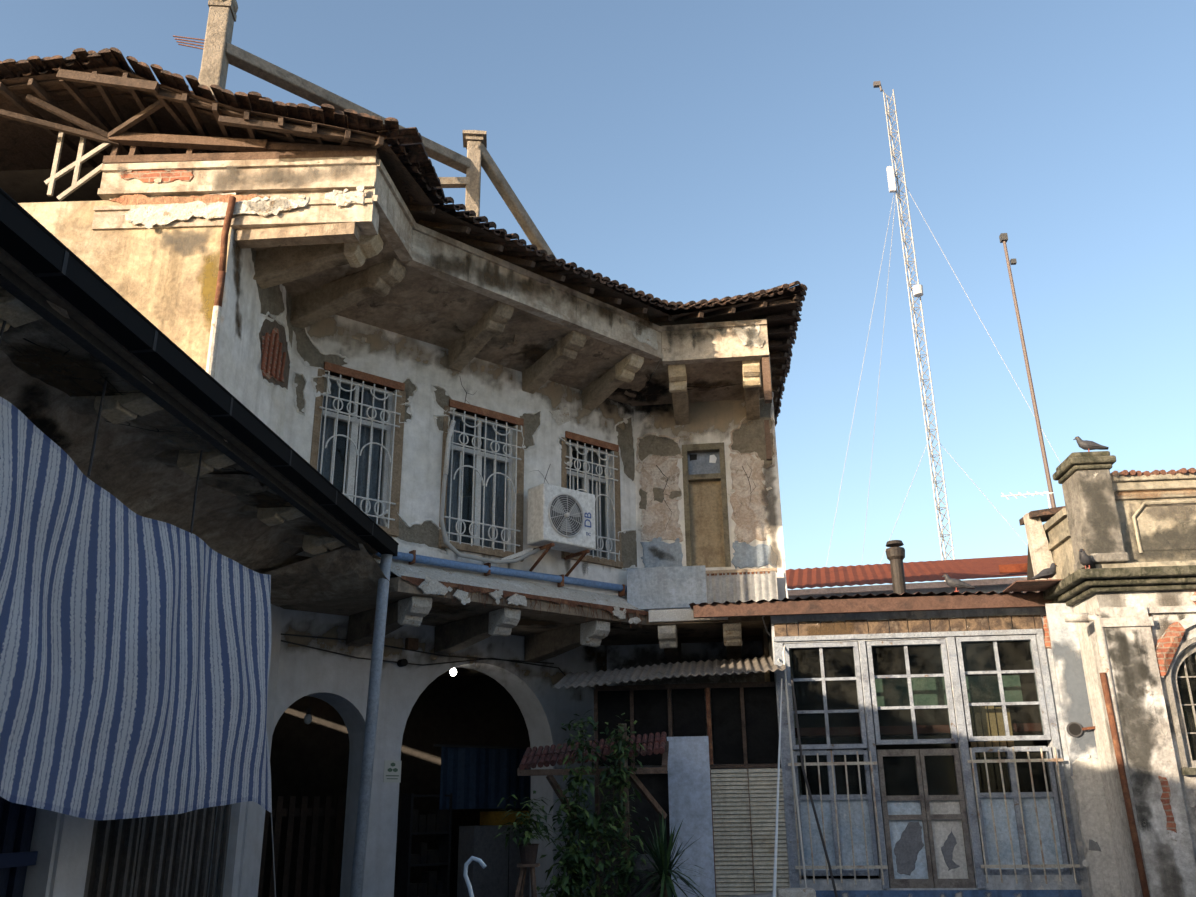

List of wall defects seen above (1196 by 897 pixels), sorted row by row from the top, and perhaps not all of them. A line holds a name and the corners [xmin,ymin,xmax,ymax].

flaking render [108,169,310,229]
flaking render [325,185,365,207]
spalling [247,248,350,416]
flaking render [614,415,683,571]
flaking render [727,392,777,569]
leakage [1078,472,1196,561]
flaking render [1148,613,1185,677]
leakage [1102,591,1196,829]
flaking render [1158,776,1177,833]
leakage [1159,846,1182,897]